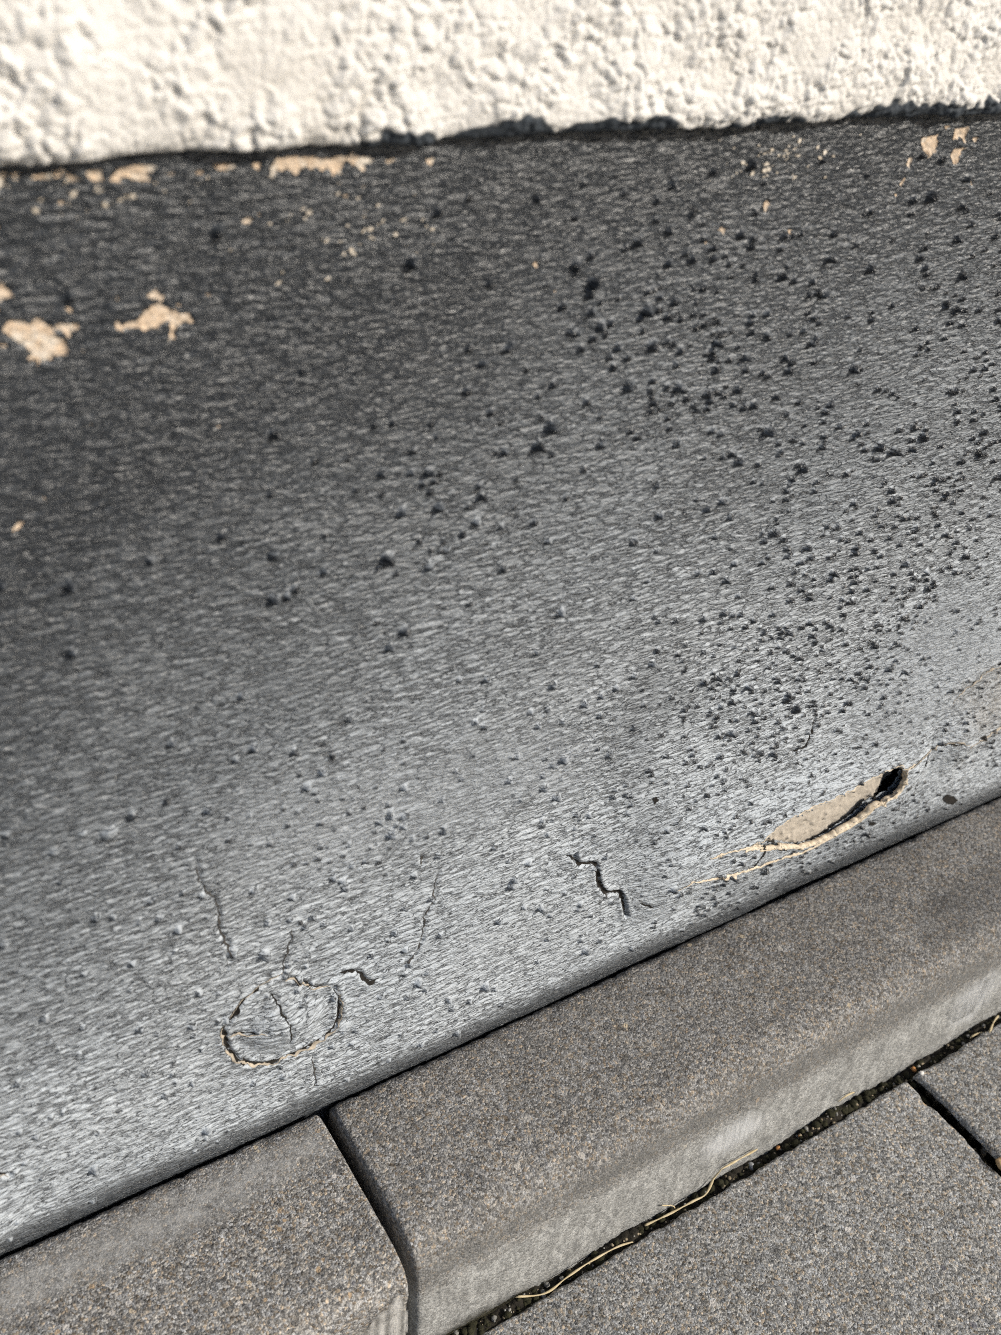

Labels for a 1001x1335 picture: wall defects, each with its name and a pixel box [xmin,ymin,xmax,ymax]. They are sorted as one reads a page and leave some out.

peeling [0,164,174,218]
peeling [195,164,235,185]
peeling [253,153,435,256]
peeling [894,126,978,197]
peeling [0,282,14,301]
peeling [0,308,84,365]
peeling [116,289,194,341]
spalling [678,764,916,891]
crack [567,855,653,915]
crack [196,862,234,969]
crack [220,855,440,1088]